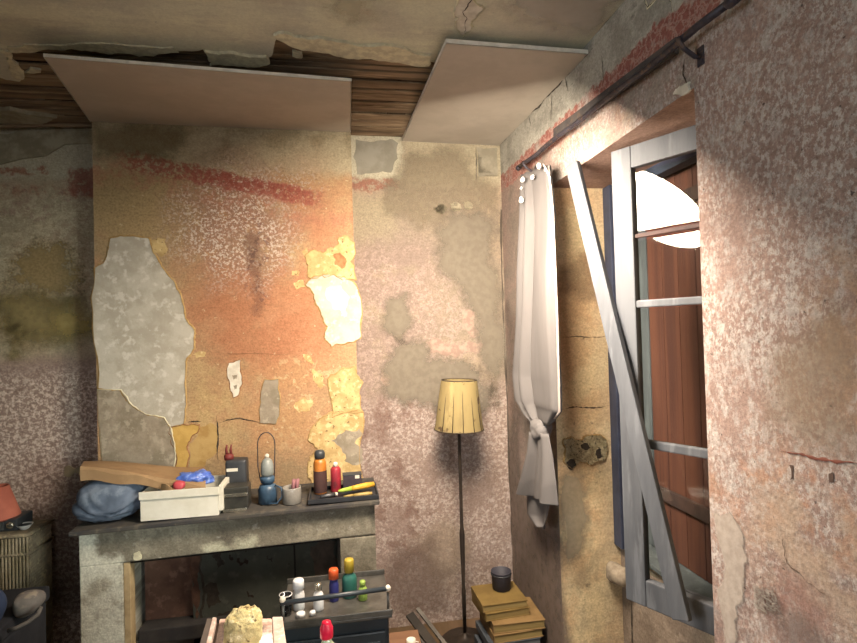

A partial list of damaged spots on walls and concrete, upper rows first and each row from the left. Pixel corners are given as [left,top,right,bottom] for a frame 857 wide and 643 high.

flaking render [0,42,179,81]
flaking render [273,31,431,67]
water stain [0,238,91,359]
flaking render [90,234,218,467]
peeling [226,360,243,398]
flaking render [292,235,363,348]
water stain [382,151,506,413]